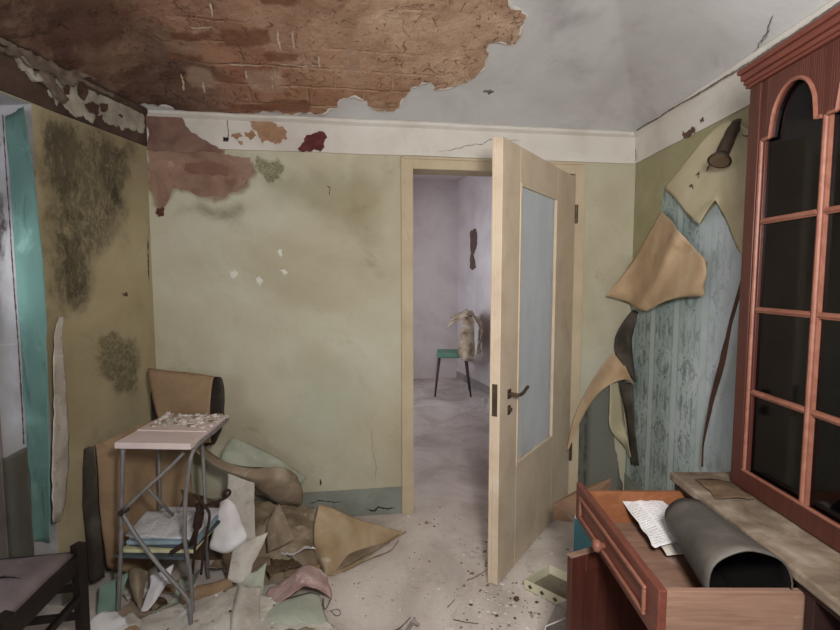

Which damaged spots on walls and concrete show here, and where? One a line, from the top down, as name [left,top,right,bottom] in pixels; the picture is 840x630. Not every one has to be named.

spalling [0,0,529,217]
crack [635,1,840,153]
mould [44,123,127,305]